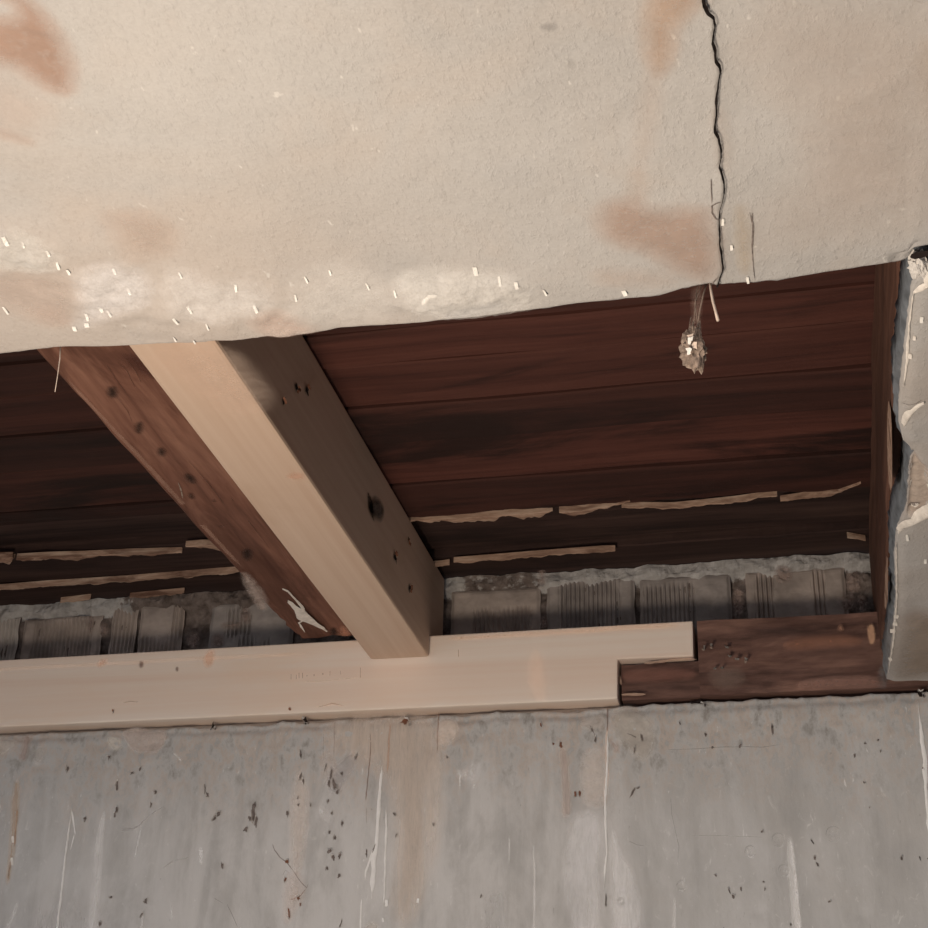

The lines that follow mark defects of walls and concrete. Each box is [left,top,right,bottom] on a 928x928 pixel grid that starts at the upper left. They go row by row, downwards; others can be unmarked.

leakage [0,7,64,86]
crack [702,0,725,288]
crack [748,213,756,279]
peeling [913,272,928,294]
spalling [896,456,928,541]